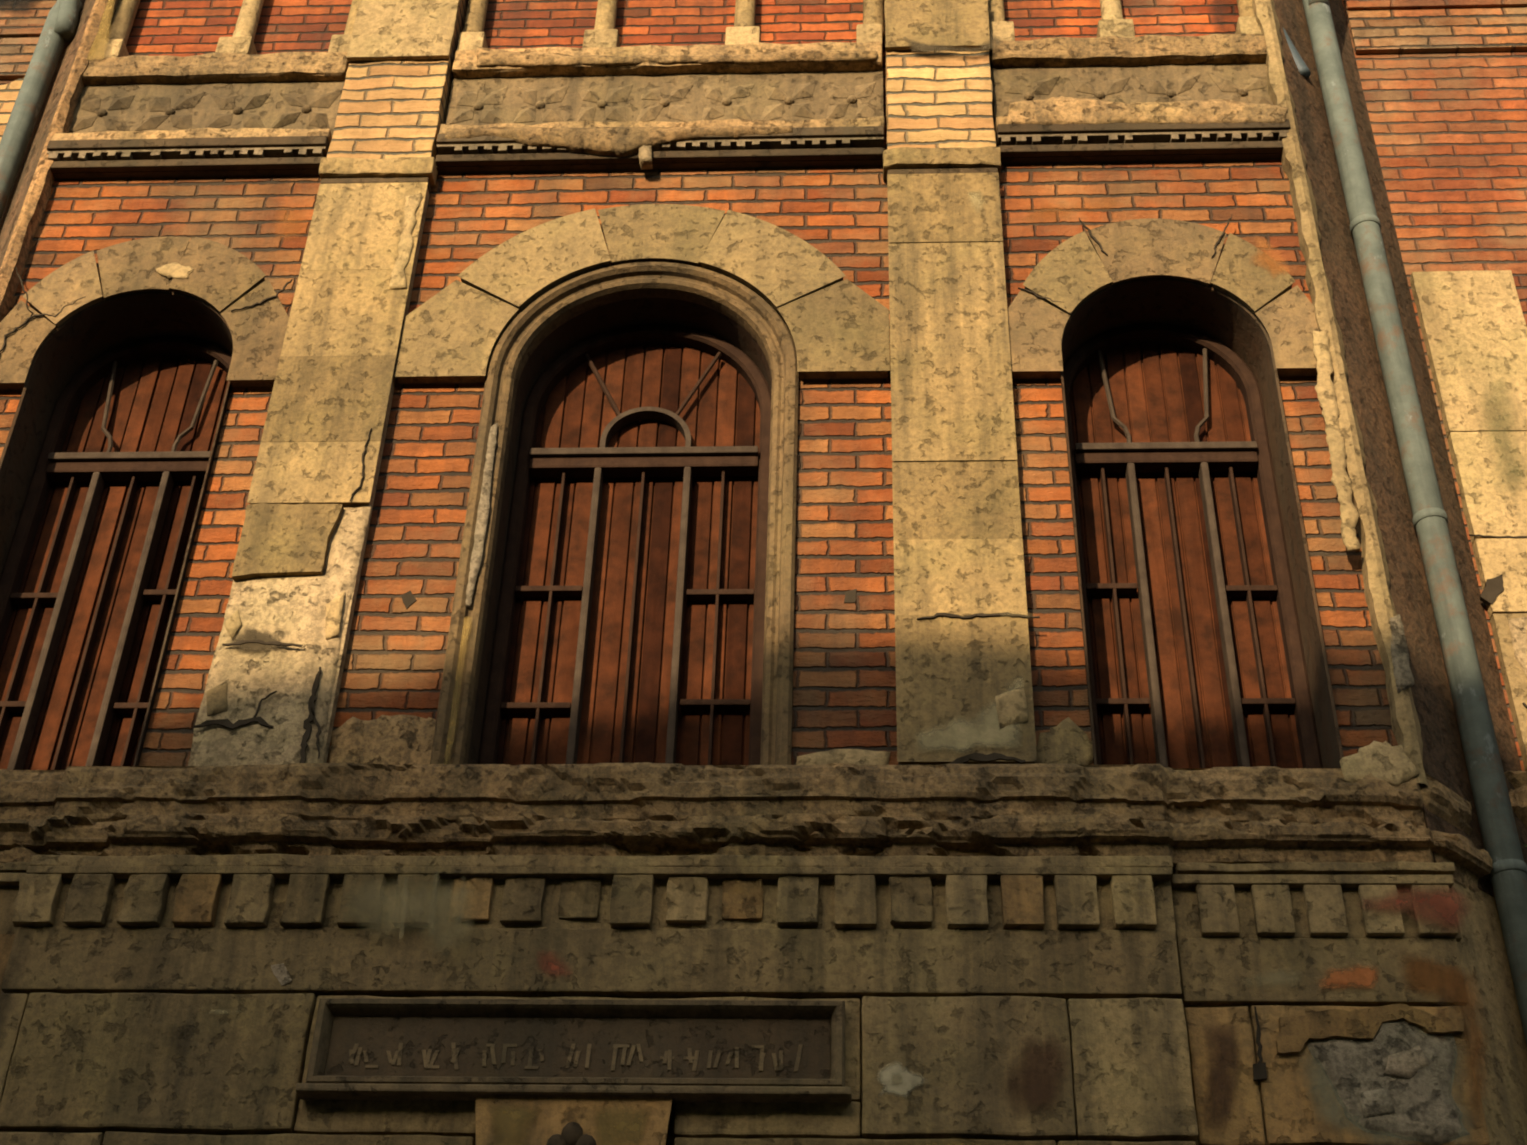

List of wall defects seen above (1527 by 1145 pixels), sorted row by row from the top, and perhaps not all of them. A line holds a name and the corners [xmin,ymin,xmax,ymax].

crack [193,667,321,763]
flaking render [920,681,1094,765]
flaking render [1323,966,1377,987]
flaking render [1276,1004,1470,1145]